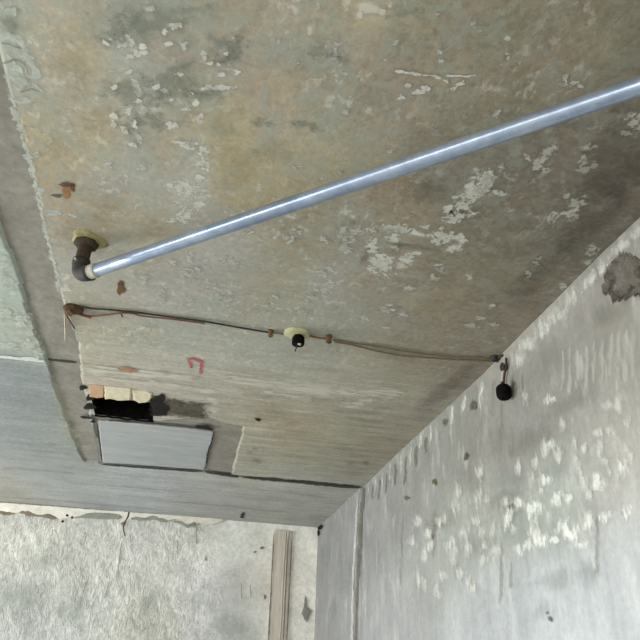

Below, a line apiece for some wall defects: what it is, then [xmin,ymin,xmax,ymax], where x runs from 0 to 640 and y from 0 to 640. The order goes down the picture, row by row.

peeling [162,22,187,51]
peeling [397,83,431,101]
peeling [395,70,476,92]
corrosion [51,182,75,199]
peeling [337,164,509,279]
peeling [546,192,589,224]
spalling [0,32,243,474]
spalling [584,228,640,303]